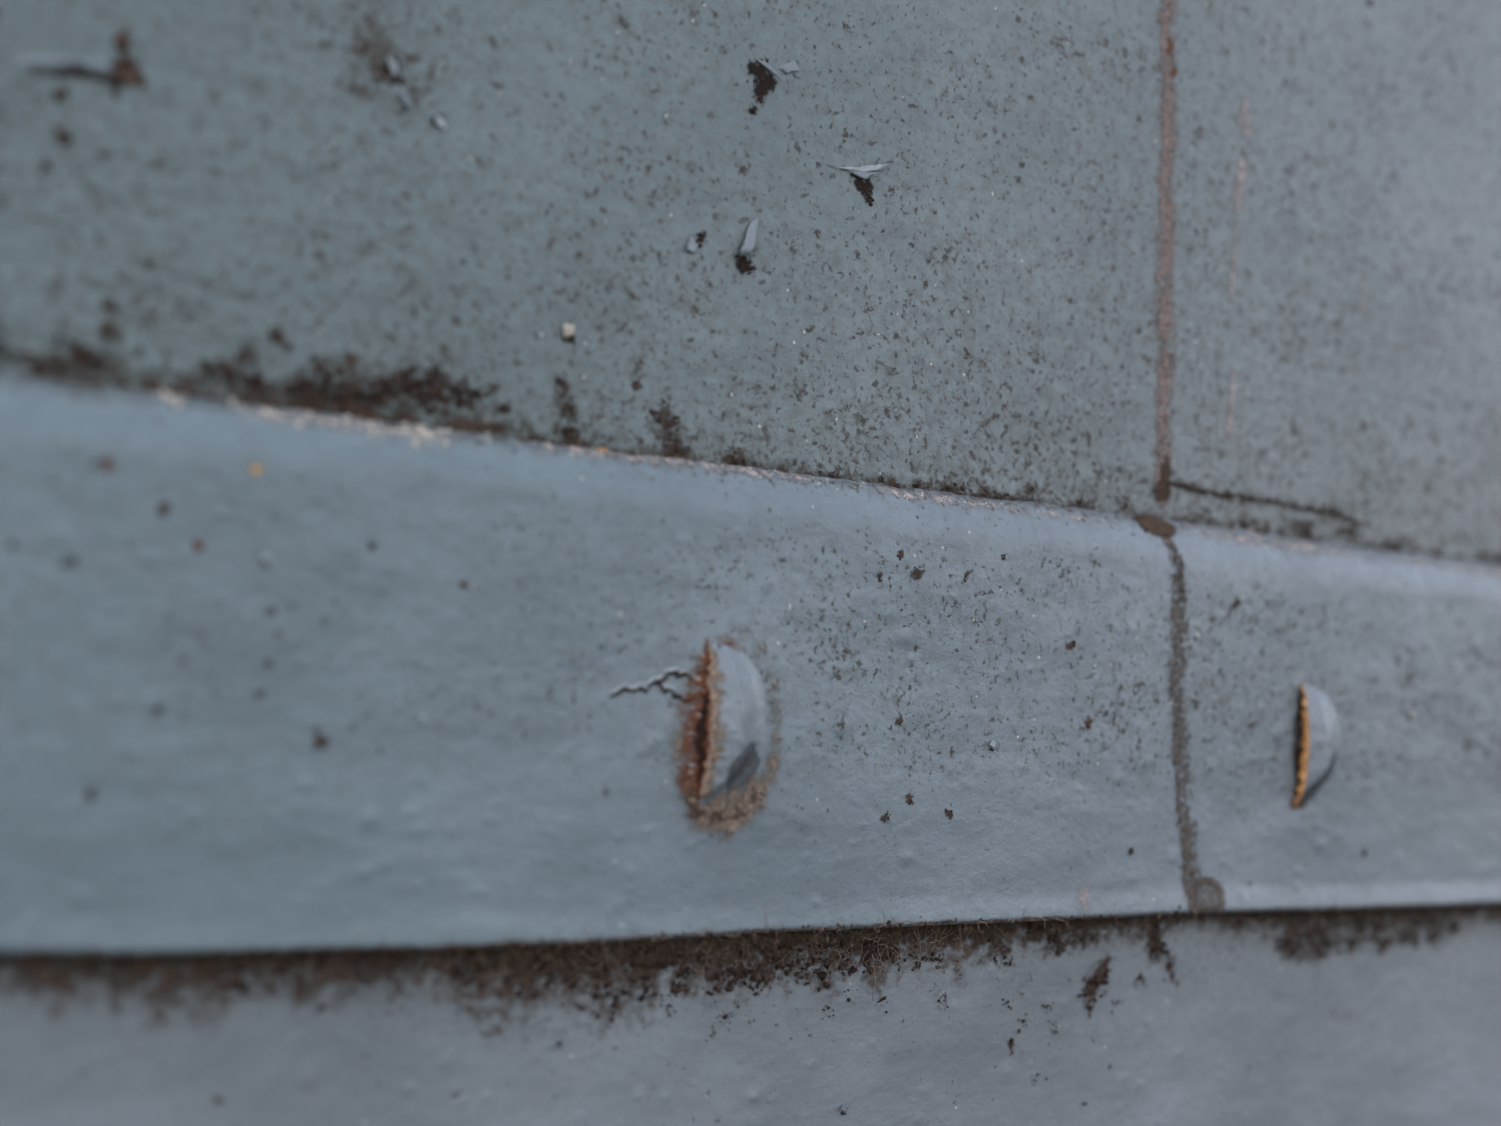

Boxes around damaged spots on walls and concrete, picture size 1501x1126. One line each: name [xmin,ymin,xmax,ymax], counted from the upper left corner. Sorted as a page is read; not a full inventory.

peeling [14,30,146,87]
peeling [747,56,800,115]
peeling [841,159,898,206]
peeling [687,230,706,254]
peeling [735,218,759,275]
rust [1153,0,1179,506]
rust [268,326,292,351]
crack [1168,481,1366,525]
crack [609,641,735,797]
rust [0,515,1501,1035]